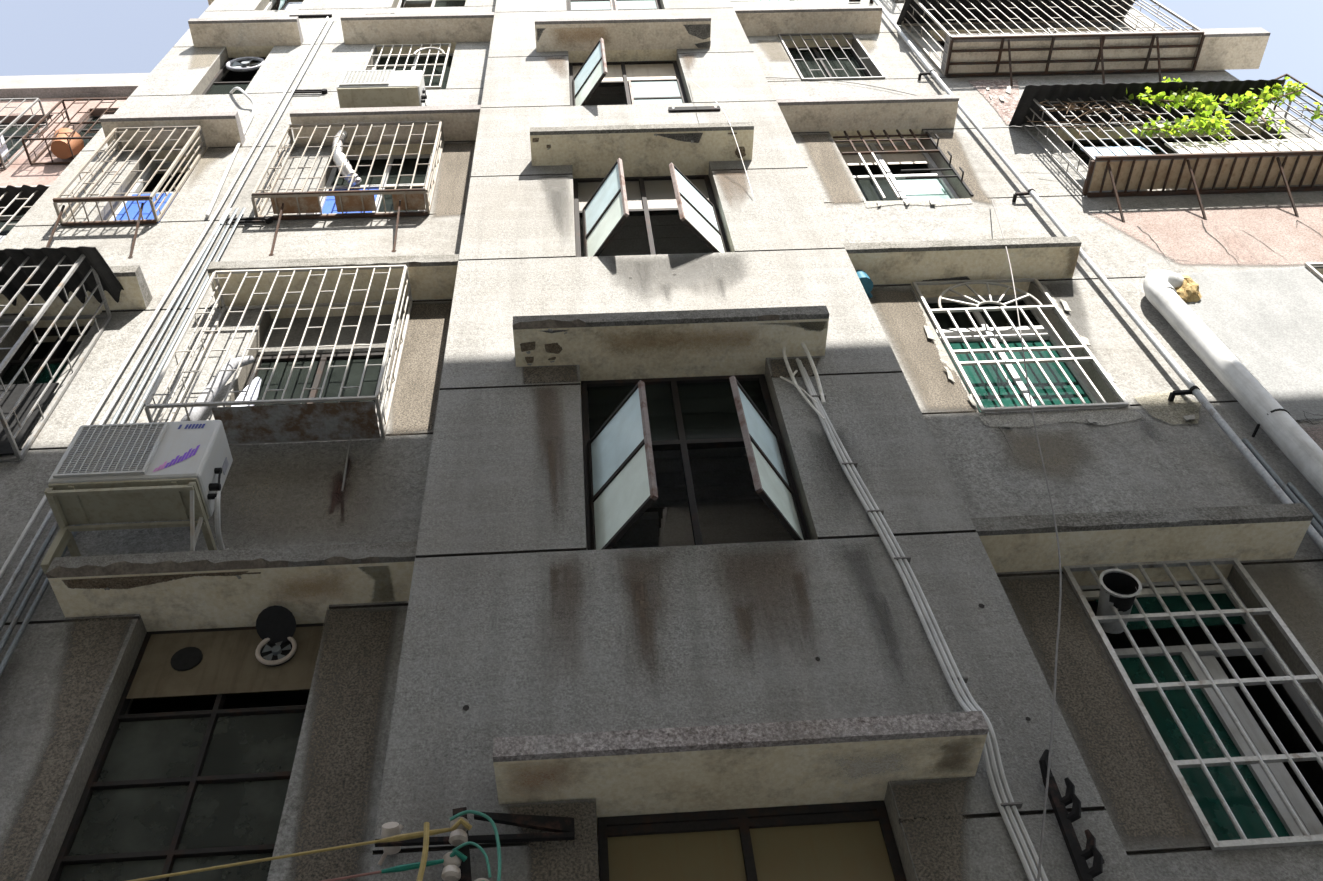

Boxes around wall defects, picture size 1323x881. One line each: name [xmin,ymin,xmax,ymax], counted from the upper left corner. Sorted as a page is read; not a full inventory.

peeling [520,329,568,365]
rust [330,458,351,521]
spalling [62,571,261,590]